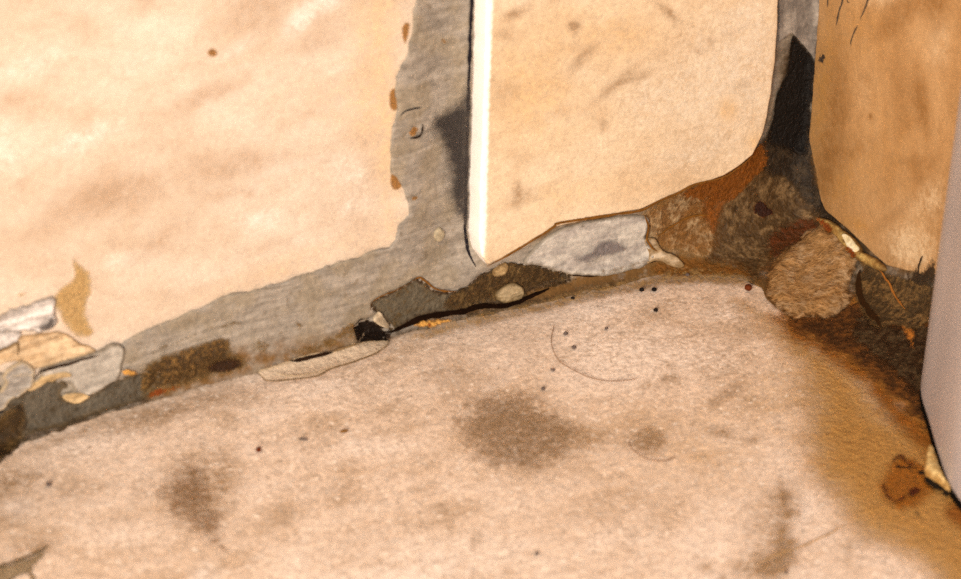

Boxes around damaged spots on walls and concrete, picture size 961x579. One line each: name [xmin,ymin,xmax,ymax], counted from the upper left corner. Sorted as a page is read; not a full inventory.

water stain [435,98,471,219]
spalling [0,296,160,458]
crack [383,288,549,333]
water stain [419,130,840,337]
rust [774,296,929,433]
water stain [855,256,935,329]
rust [881,454,933,515]
rust [947,502,961,527]